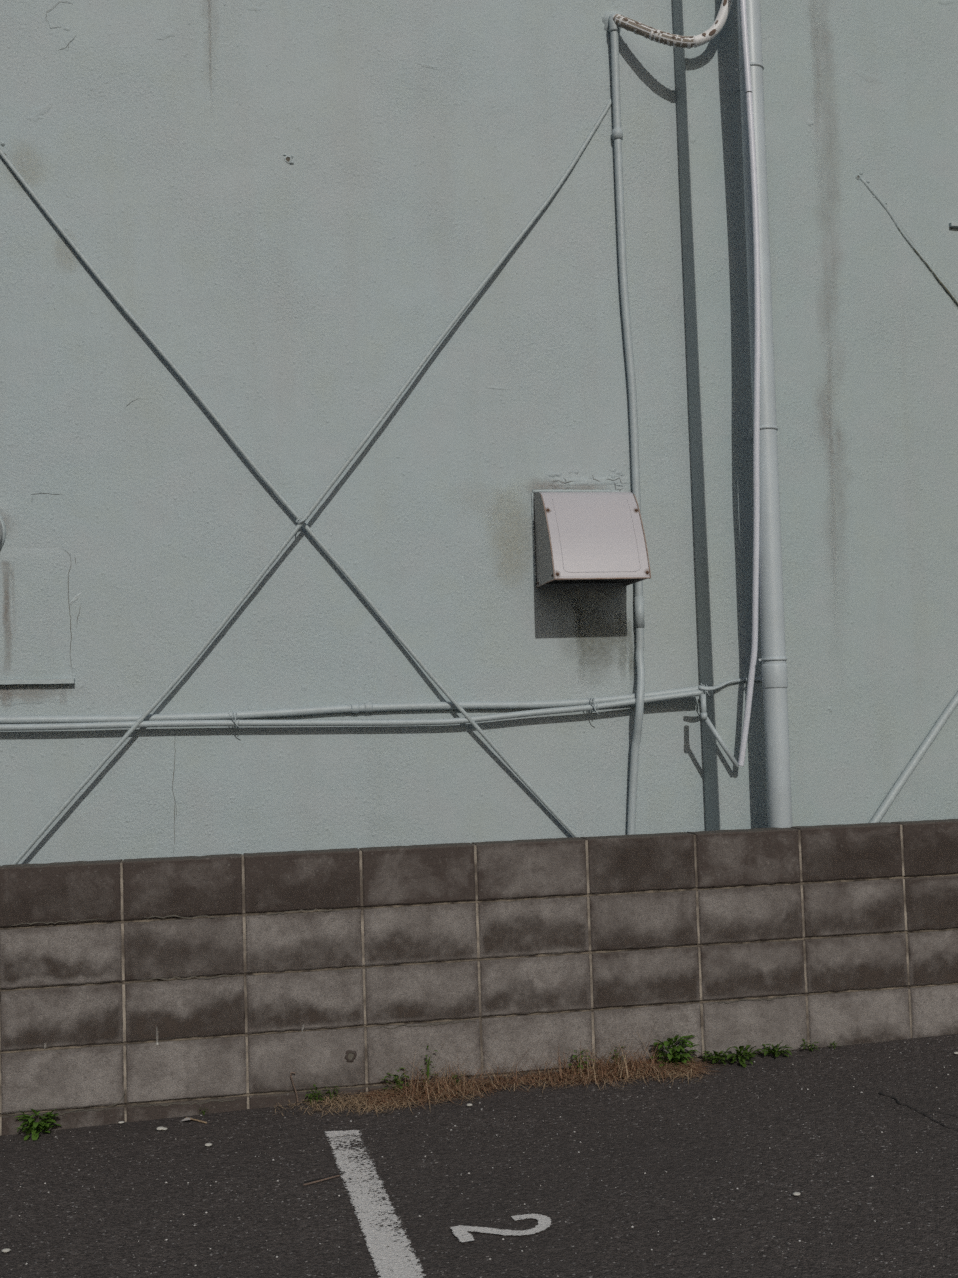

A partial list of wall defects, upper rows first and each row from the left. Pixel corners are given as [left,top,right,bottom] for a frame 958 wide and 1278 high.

crack [894,221,958,304]